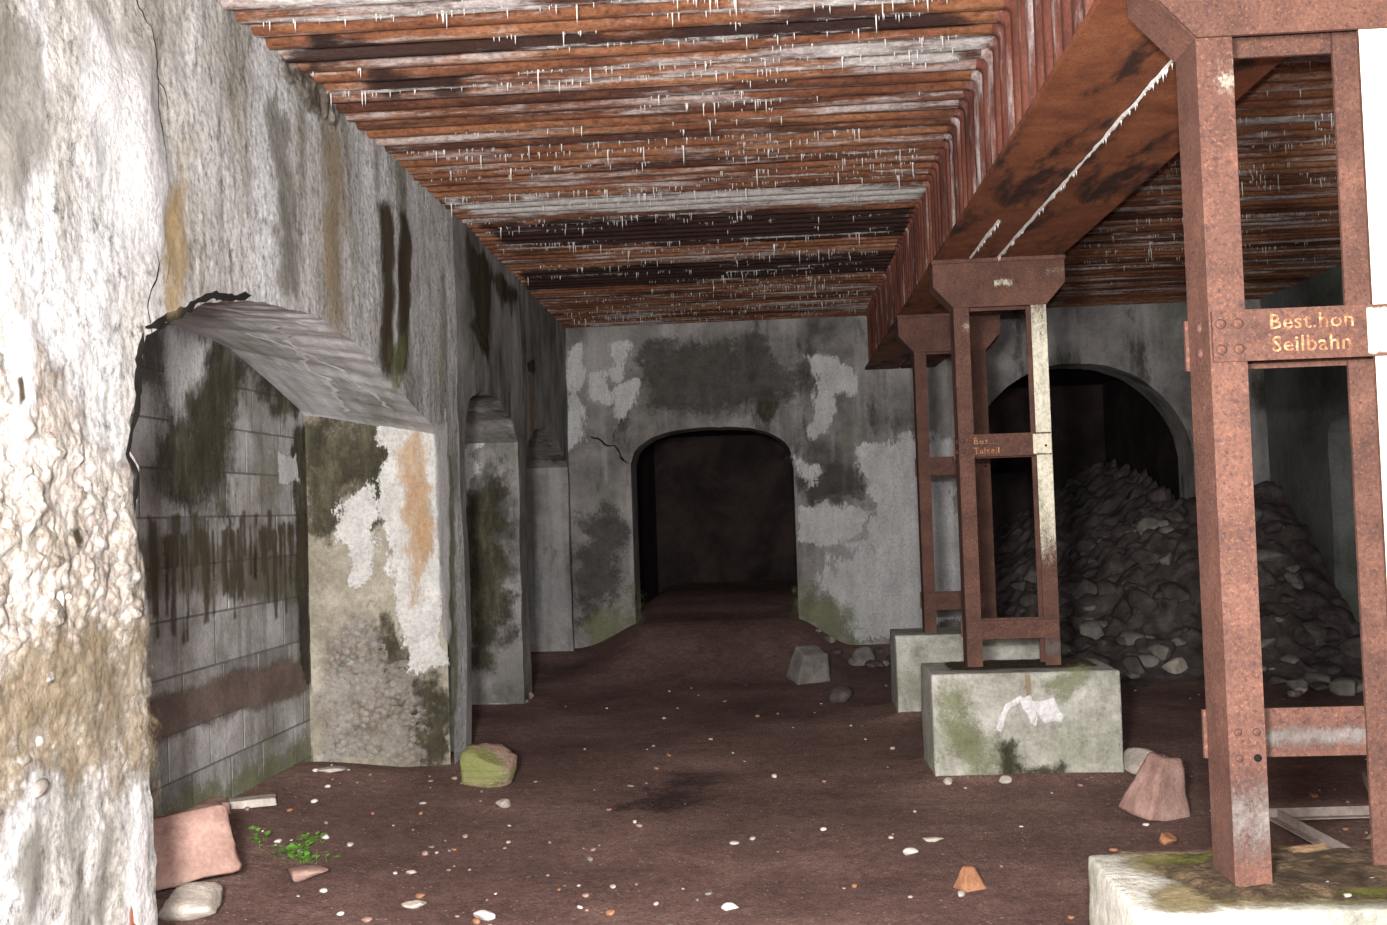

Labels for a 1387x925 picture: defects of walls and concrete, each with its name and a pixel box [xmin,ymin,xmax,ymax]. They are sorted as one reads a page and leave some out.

leakage [254,0,993,415]
leakage [969,219,1002,259]
leakage [997,60,1173,261]
leakage [1080,218,1183,270]
leakage [1239,113,1336,196]
leakage [1242,210,1341,262]
flaking render [566,339,641,451]
leakage [140,426,311,746]
flaking render [310,408,488,831]
leakage [575,499,629,626]
leakage [996,695,1065,774]
rust [1291,843,1326,852]